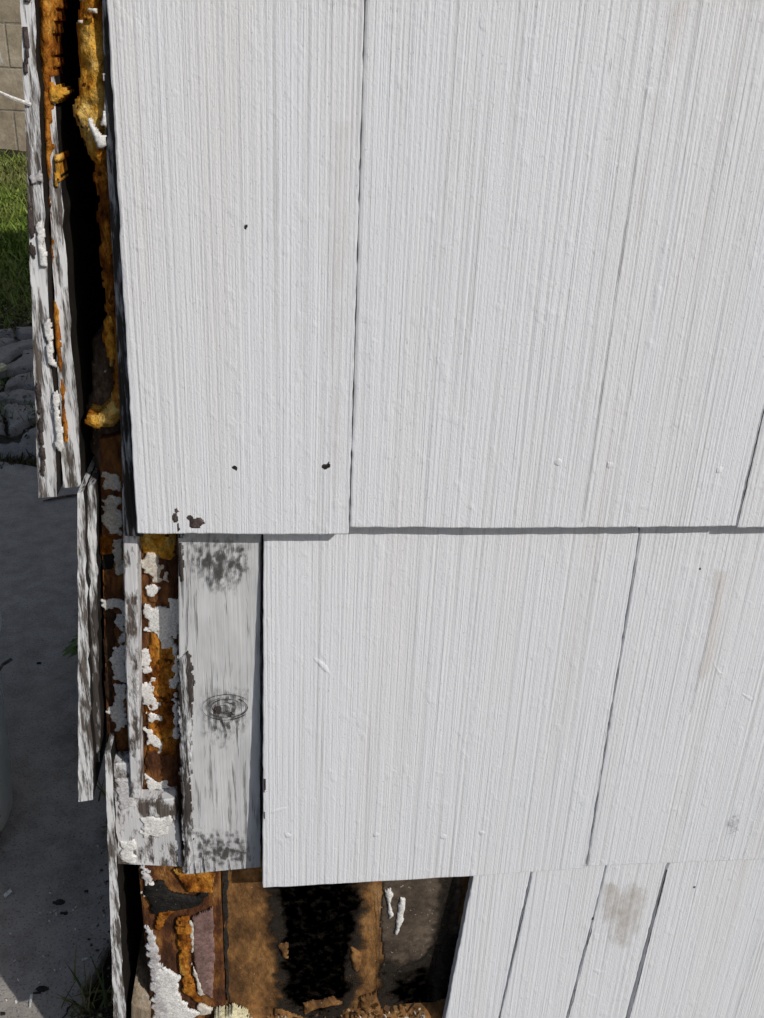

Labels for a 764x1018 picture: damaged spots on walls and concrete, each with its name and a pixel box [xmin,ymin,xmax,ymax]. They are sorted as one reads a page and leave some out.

peeling [88,111,107,149]
peeling [43,319,57,368]
crack [737,411,764,526]
water stain [192,540,248,589]
peeling [101,598,128,731]
peeling [141,552,180,754]
water stain [208,692,239,739]
water stain [144,880,209,914]
peeling [144,906,215,1018]
water stain [265,882,370,1018]
water stain [377,877,460,1008]
peeling [380,877,462,1000]